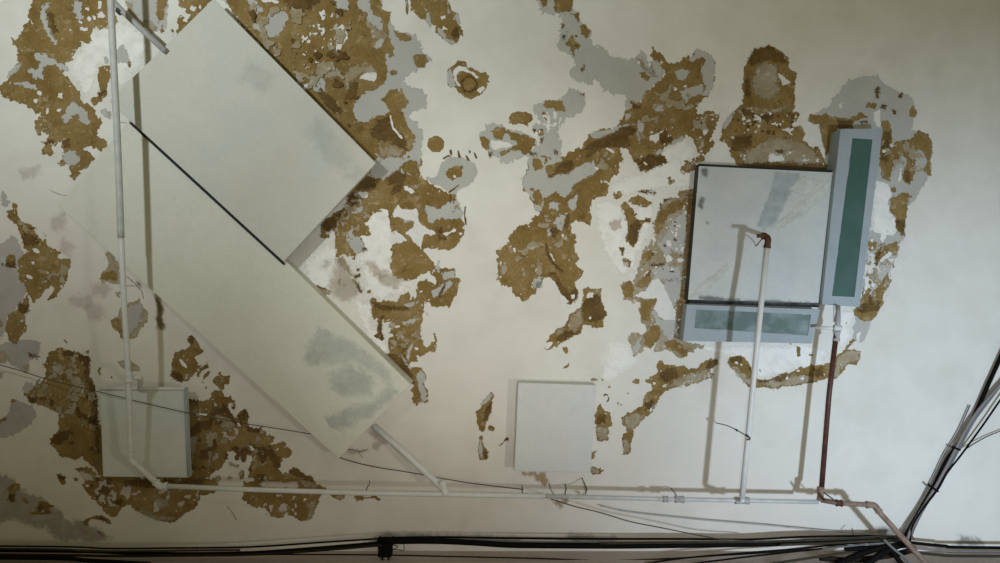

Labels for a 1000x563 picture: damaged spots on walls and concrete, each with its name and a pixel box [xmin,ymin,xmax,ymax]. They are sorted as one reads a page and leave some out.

peeling [0,0,131,181]
peeling [0,191,381,536]
peeling [125,0,478,406]
flaking render [446,61,490,99]
peeling [476,392,495,460]
peeling [479,0,933,475]